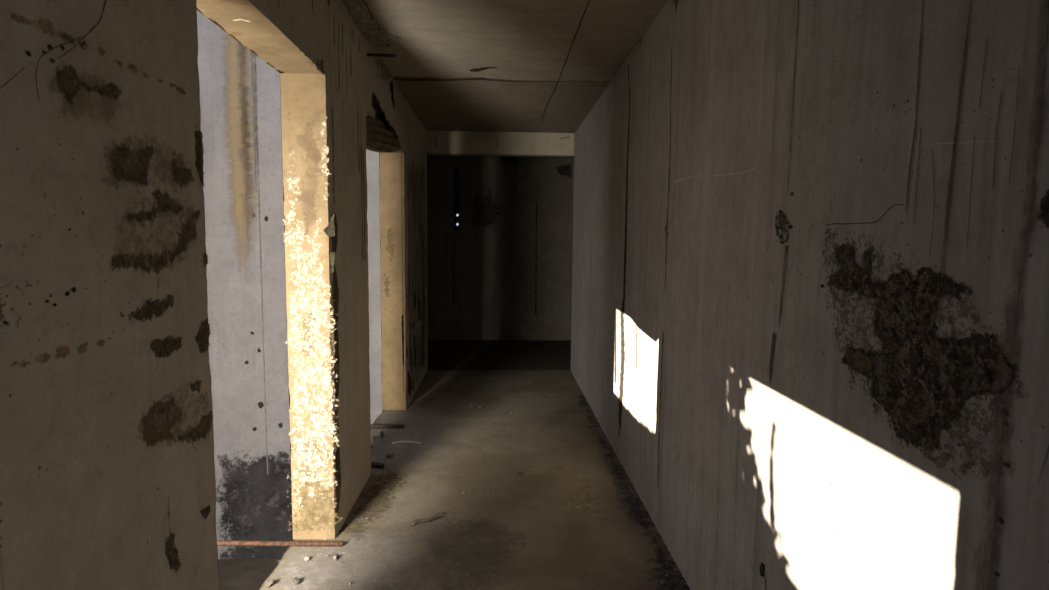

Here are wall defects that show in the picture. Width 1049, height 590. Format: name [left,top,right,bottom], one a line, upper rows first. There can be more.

spalling [52,65,121,118]
spalling [105,130,205,273]
spalling [1037,190,1049,229]
spalling [820,227,1028,479]
spalling [140,380,212,446]